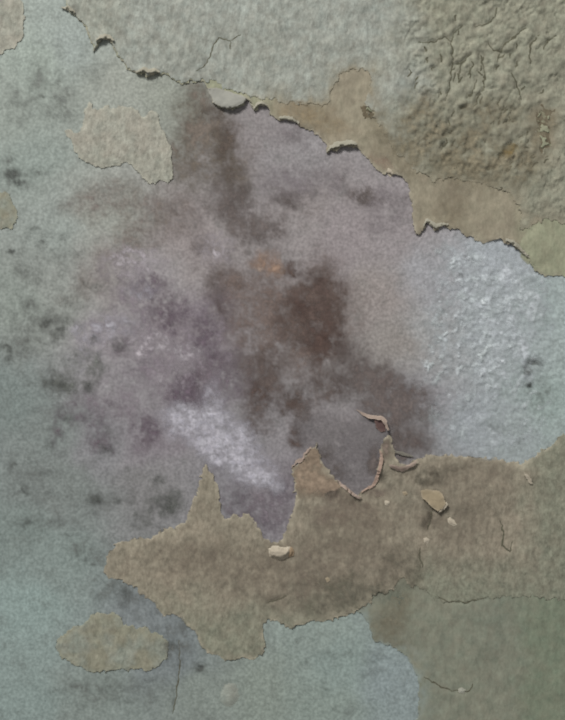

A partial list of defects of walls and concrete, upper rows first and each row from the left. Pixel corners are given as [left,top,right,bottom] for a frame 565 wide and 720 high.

damp [171,85,281,240]
peeling [61,0,565,277]
crack [407,7,556,172]
damp [73,220,437,526]
damp [429,241,547,458]
peeling [103,409,565,661]
crack [439,596,484,604]